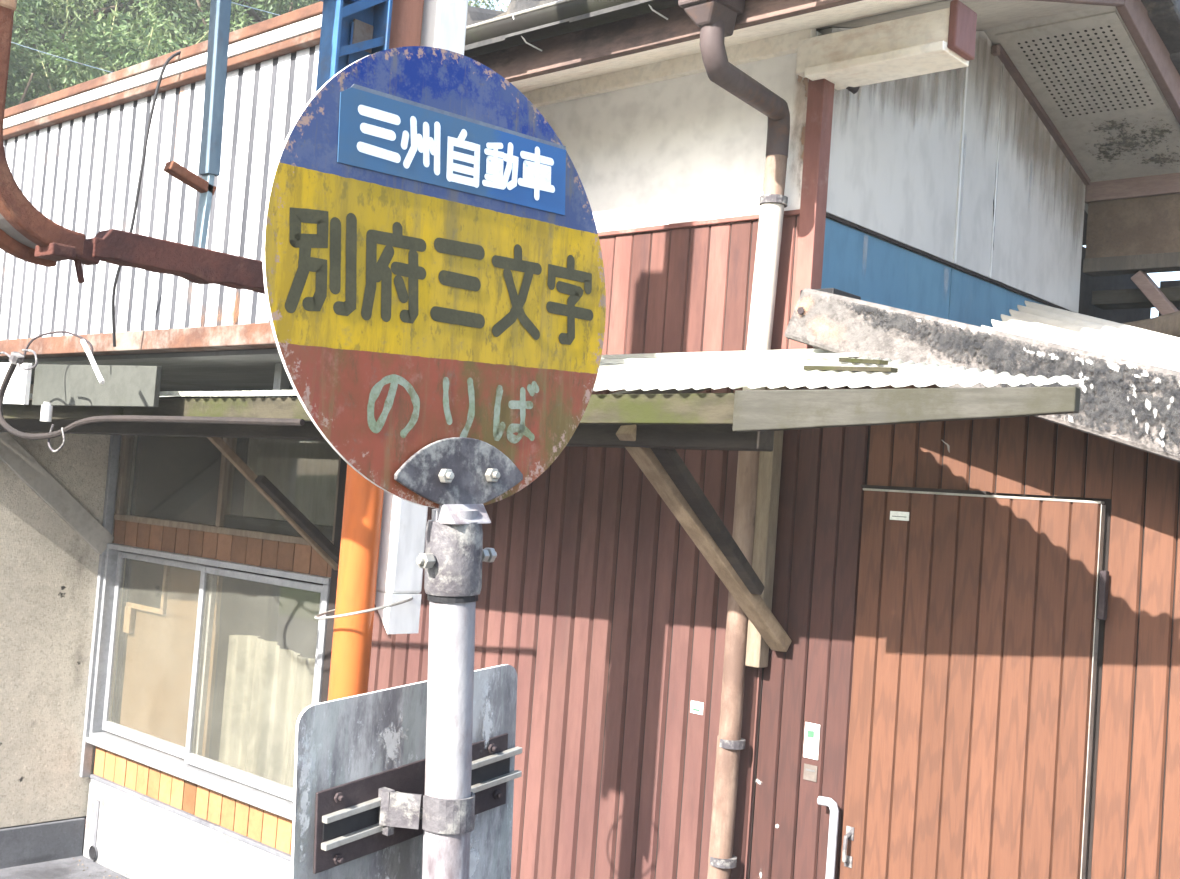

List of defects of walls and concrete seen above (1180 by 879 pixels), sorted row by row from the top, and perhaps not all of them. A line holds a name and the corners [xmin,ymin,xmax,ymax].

water stain [1091,118,1180,166]
water stain [844,302,1180,455]